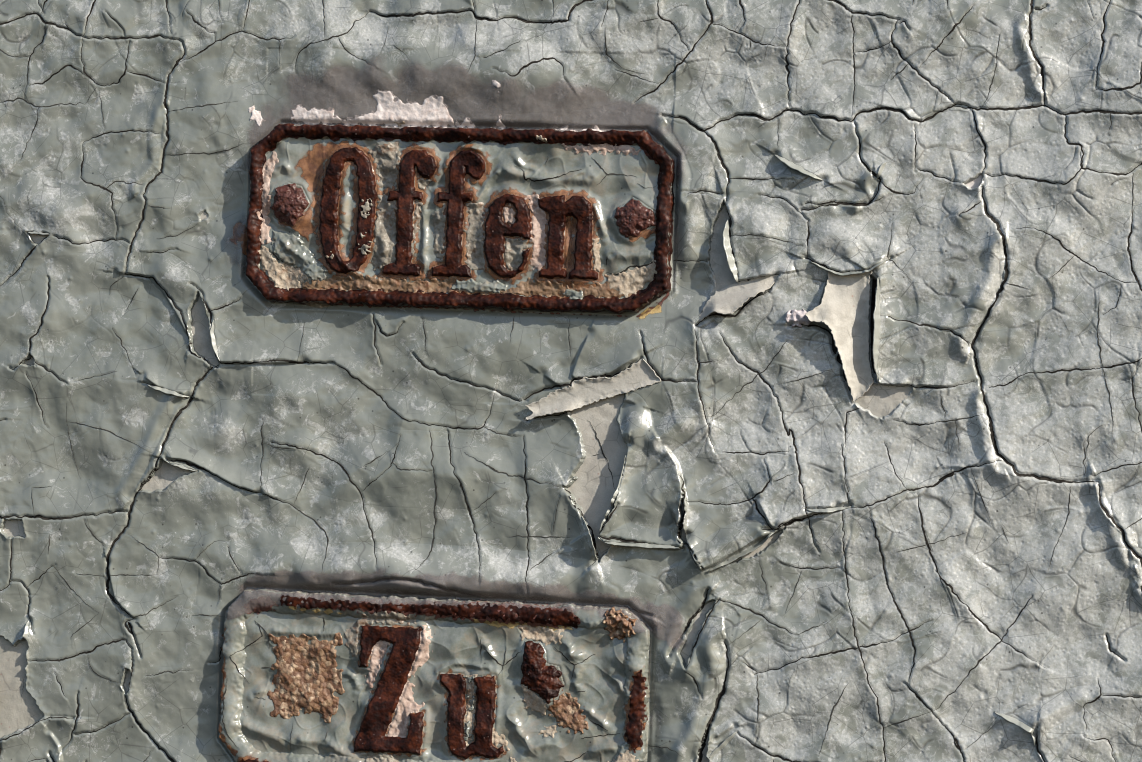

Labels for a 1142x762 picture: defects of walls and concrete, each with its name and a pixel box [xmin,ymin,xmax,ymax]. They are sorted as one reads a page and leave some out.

peeling [291,91,475,128]
crack [0,0,823,762]
corrosion [278,141,604,316]
corrosion [247,65,661,169]
peeling [256,141,657,308]
peeling [525,359,687,560]
corrosion [637,291,669,319]
corrosion [673,147,682,177]
crack [296,0,1142,762]
peeling [699,205,778,321]
peeling [784,270,912,417]
corrosion [218,569,683,762]